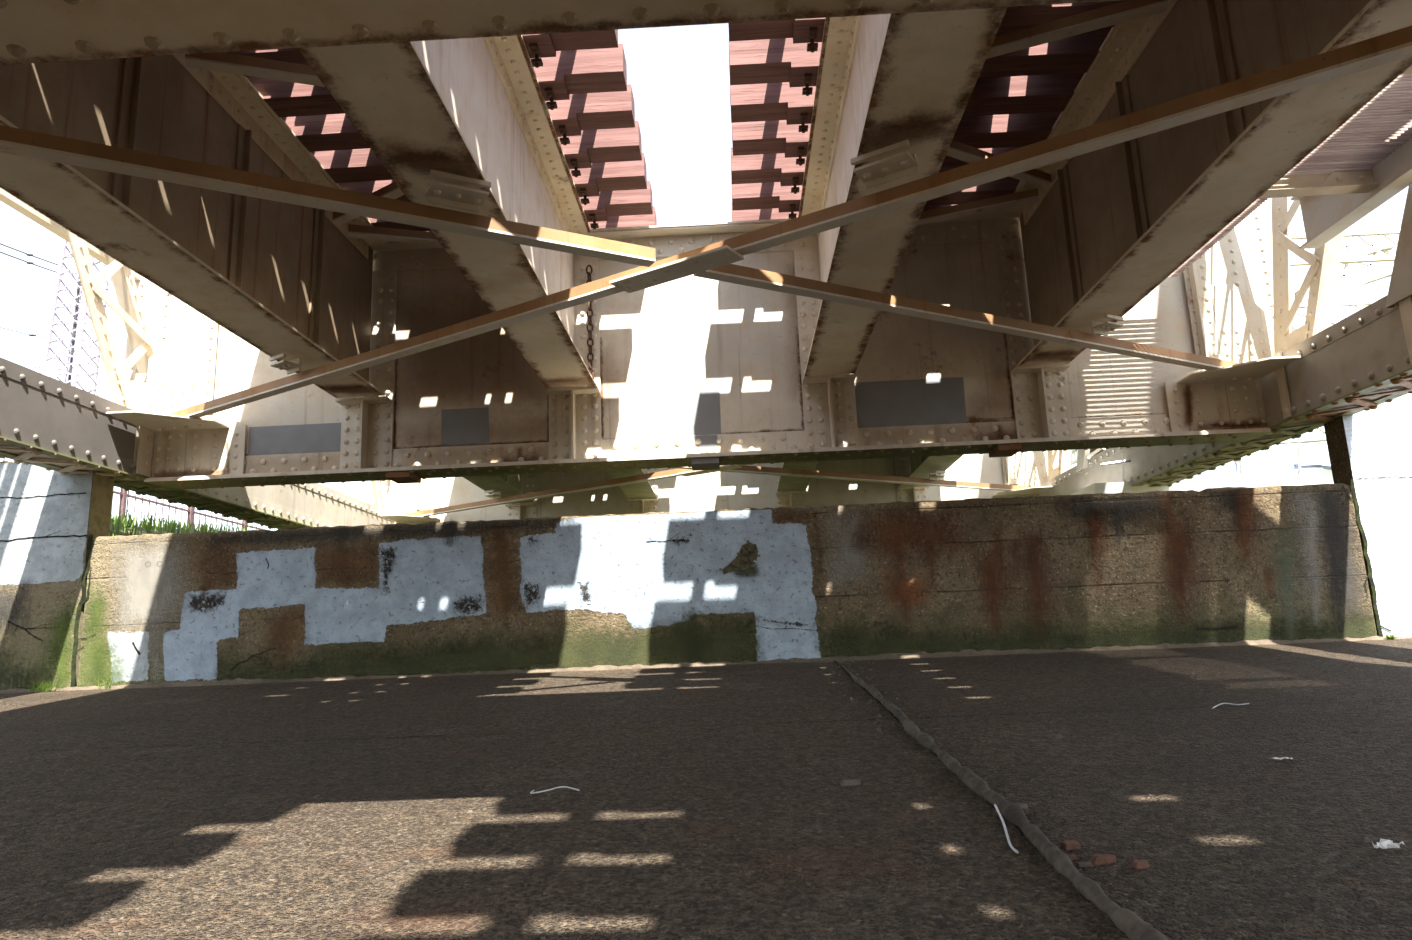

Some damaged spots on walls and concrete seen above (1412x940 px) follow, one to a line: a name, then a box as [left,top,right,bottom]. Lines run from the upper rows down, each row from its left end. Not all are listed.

corrosion [517,17,743,233]
corrosion [762,0,1111,217]
corrosion [827,225,846,283]
corrosion [730,300,828,434]
corrosion [851,313,880,374]
crack [0,491,86,499]
crack [0,529,96,687]
peeling [183,591,229,615]
peeling [374,545,398,595]
peeling [448,594,484,615]
peeling [522,579,542,609]